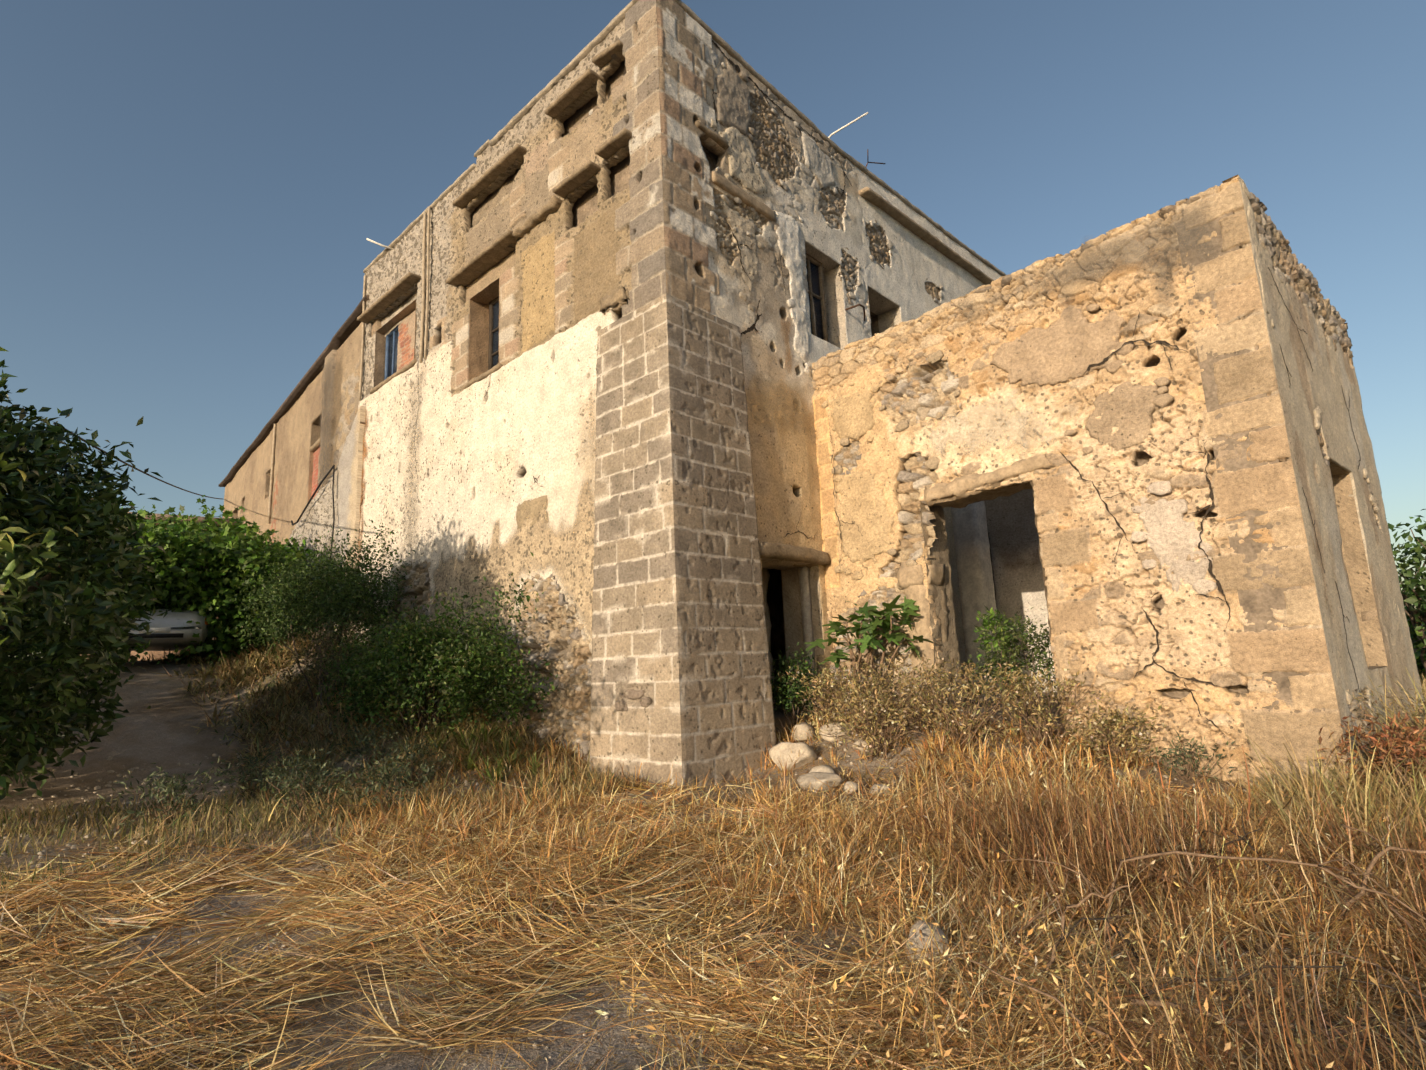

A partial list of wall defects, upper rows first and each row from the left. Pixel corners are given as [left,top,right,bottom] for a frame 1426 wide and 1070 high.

spalling [689,31,894,376]
flaking render [990,304,1174,467]
leakage [430,482,595,666]
spalling [504,574,592,755]
flaking render [1130,481,1217,612]